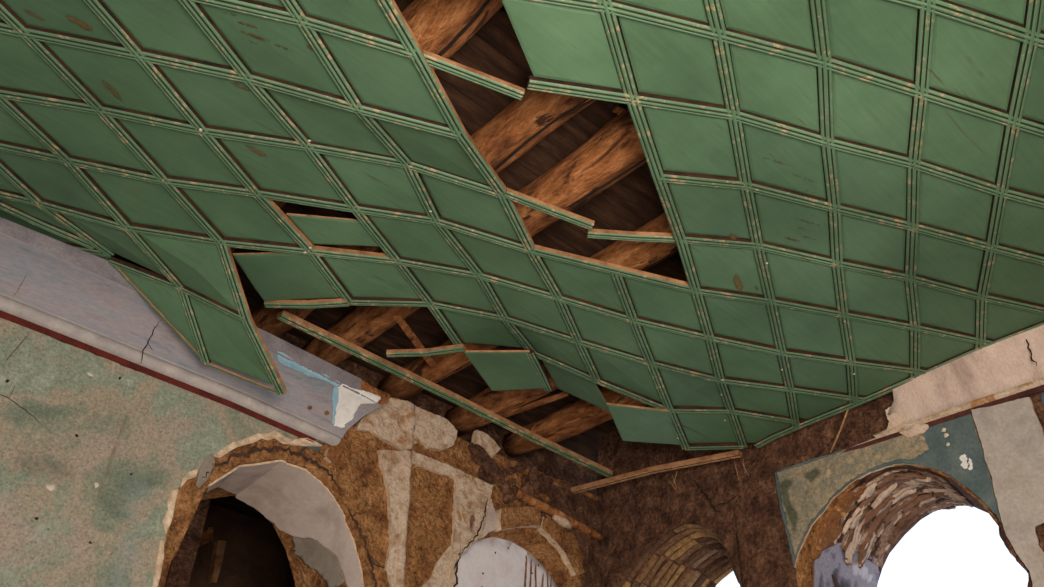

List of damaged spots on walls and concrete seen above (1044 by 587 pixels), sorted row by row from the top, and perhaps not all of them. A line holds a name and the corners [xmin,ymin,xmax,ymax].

crack [140,320,161,364]
flaking render [152,351,1033,587]
flaking render [1035,523,1044,552]